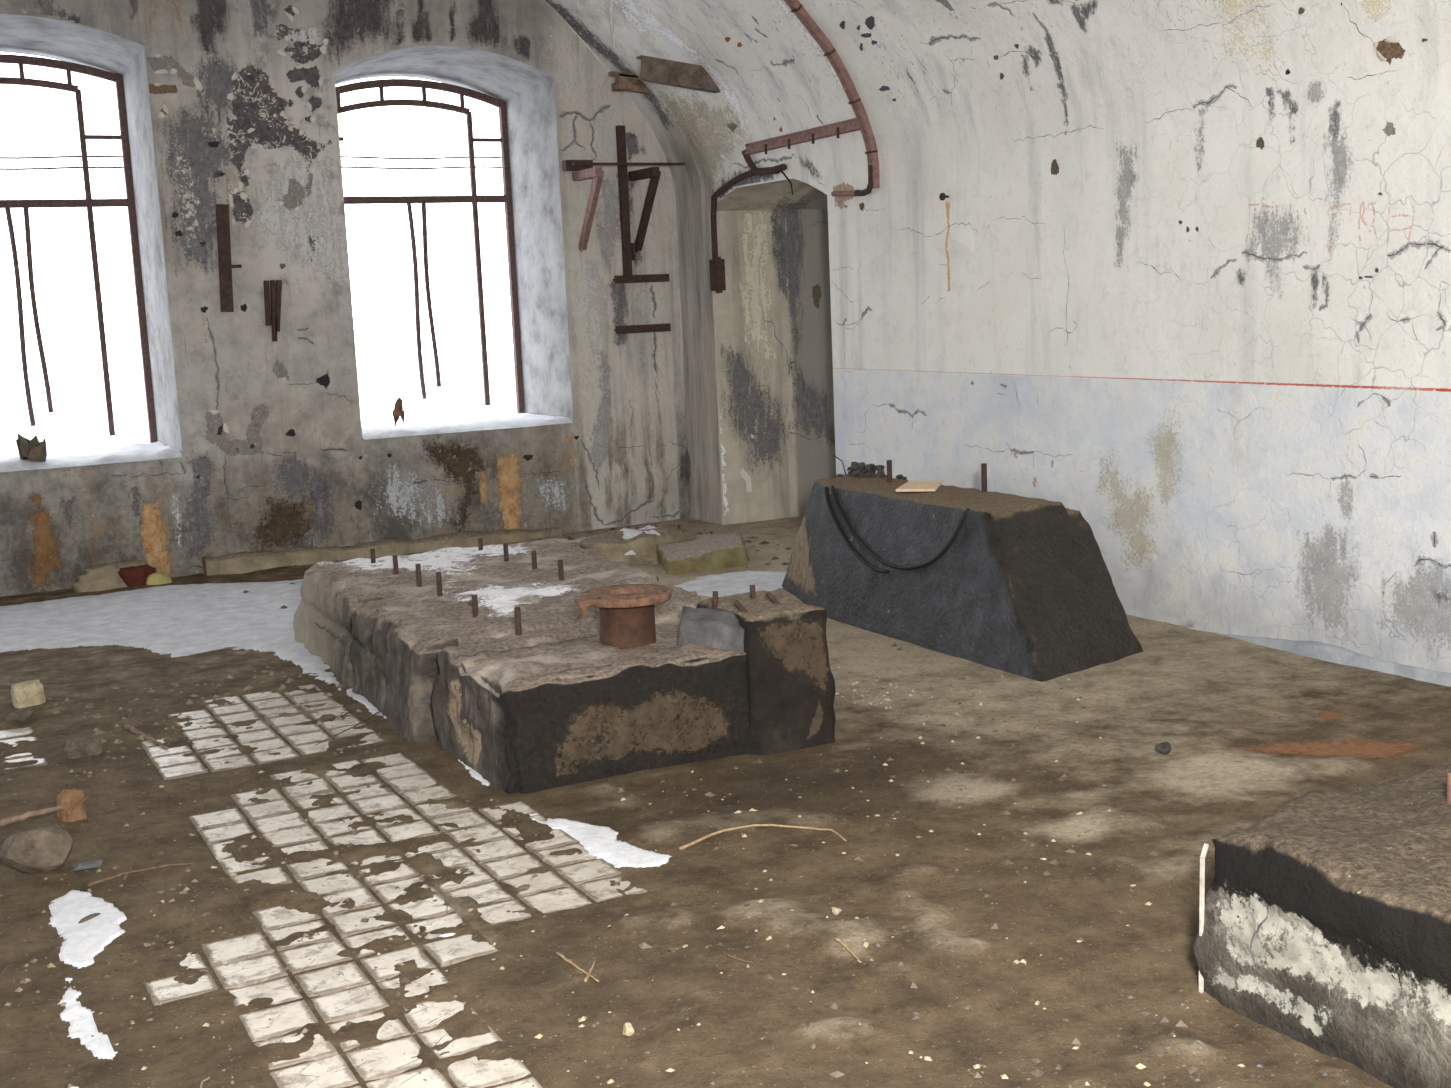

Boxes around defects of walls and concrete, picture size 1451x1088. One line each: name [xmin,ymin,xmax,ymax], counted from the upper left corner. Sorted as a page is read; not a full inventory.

spalling [147,54,203,118]
peeling [201,5,346,285]
water stain [607,0,774,198]
crack [1146,84,1251,123]
spalling [1373,36,1406,64]
crack [1139,240,1451,343]
water stain [719,197,834,516]
corrosion [29,492,65,593]
corrosion [140,478,173,577]
corrosion [475,449,525,530]
water stain [1297,479,1358,638]
crack [1382,531,1451,638]